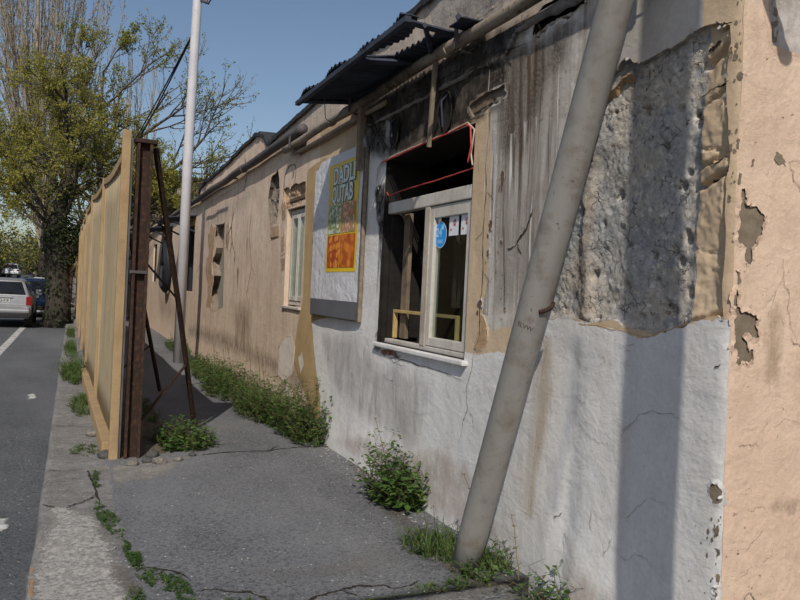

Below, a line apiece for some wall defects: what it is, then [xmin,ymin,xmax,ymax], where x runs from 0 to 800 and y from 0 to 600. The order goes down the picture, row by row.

peeling [764,0,800,57]
spalling [268,170,306,271]
crack [362,114,494,433]
damp [483,42,559,296]
spalling [548,20,768,372]
crack [133,567,270,600]
crack [309,580,455,600]
peeling [700,479,727,600]